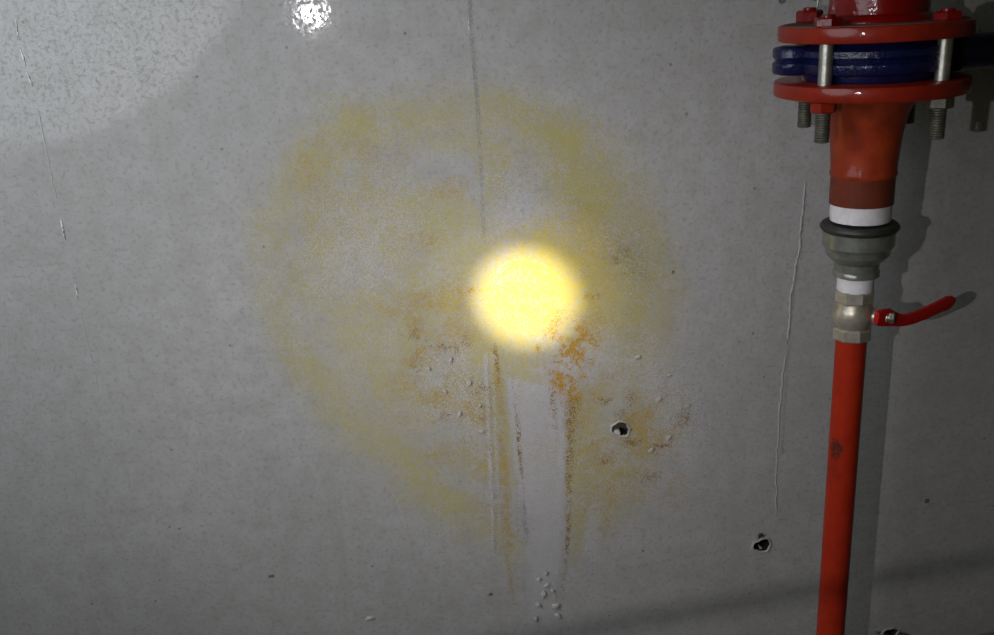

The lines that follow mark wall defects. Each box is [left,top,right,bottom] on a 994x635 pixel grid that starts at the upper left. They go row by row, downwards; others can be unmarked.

crack [467,0,487,243]
damp [234,68,702,622]
crack [483,351,528,554]
rust [535,308,607,520]